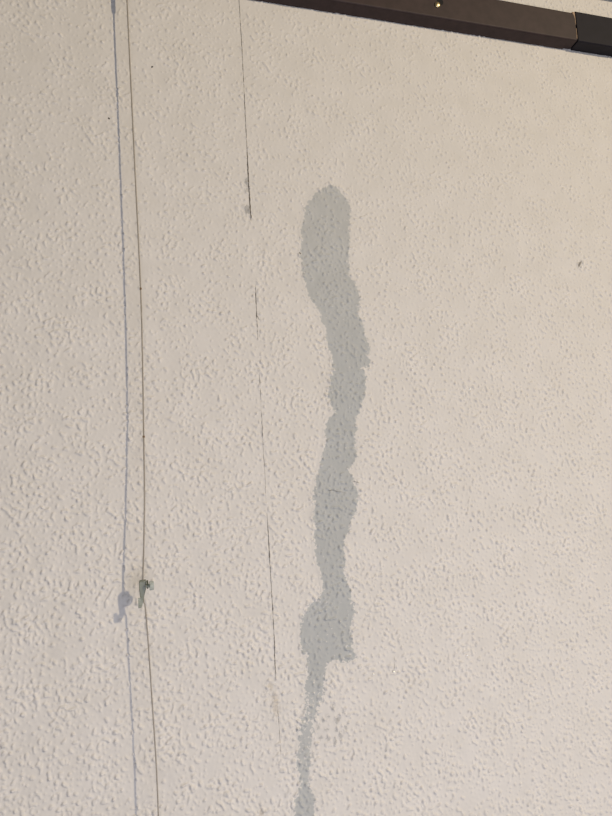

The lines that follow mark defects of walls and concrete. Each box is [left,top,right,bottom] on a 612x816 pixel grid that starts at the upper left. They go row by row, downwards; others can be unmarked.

crack [243,157,252,217]
leakage [291,182,374,816]
crack [267,519,276,673]